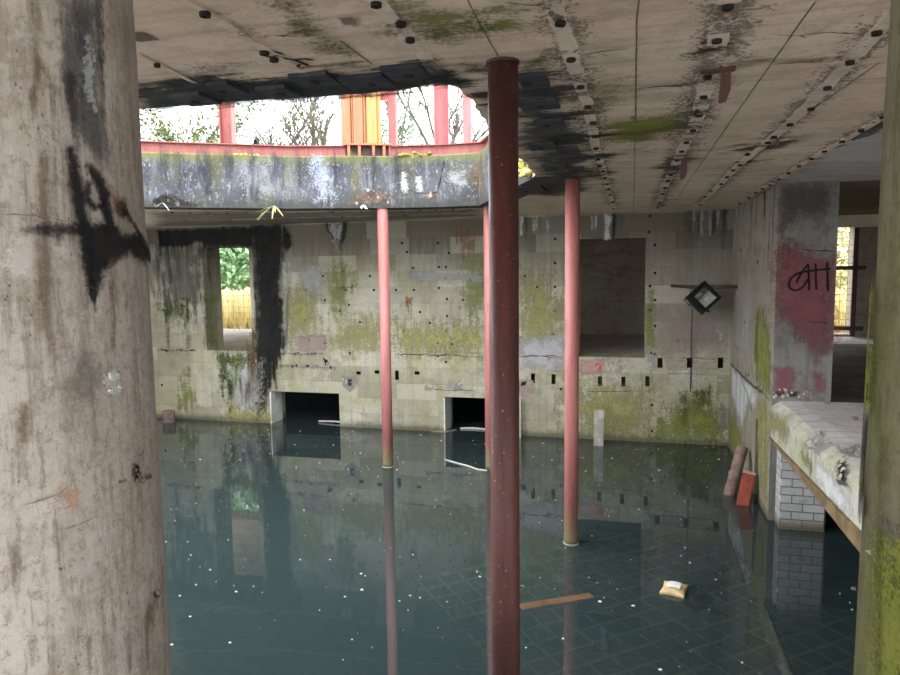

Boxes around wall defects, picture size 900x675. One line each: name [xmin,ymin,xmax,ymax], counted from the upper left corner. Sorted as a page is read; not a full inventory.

water stain [30,0,109,163]
water stain [197,149,233,193]
water stain [388,209,473,220]
water stain [518,69,625,196]
water stain [150,211,377,419]
spalling [803,430,861,487]